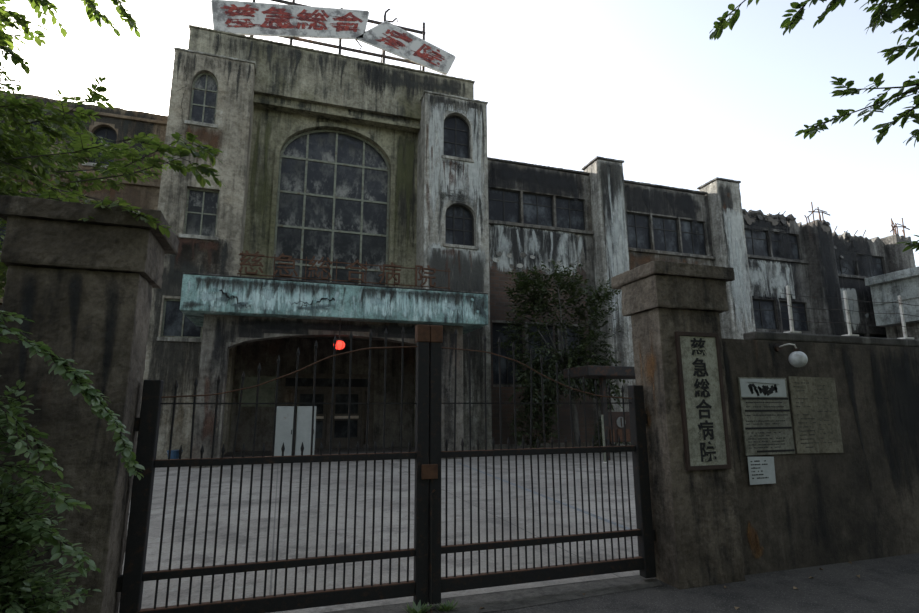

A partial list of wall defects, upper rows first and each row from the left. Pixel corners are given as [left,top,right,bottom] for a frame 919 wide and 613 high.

leakage [177,35,275,97]
leakage [289,50,346,84]
leakage [348,109,410,123]
leakage [358,62,484,153]
leakage [720,185,797,330]
spalling [742,202,866,259]
crack [220,289,251,308]
crack [289,297,335,307]
leakage [148,164,586,456]